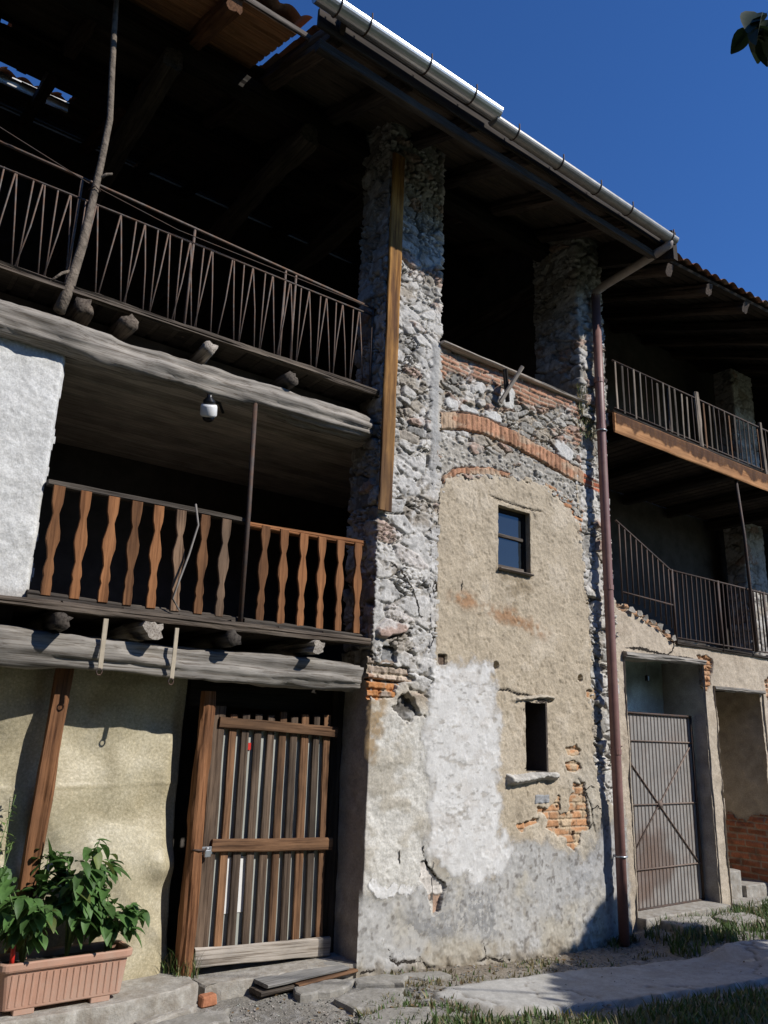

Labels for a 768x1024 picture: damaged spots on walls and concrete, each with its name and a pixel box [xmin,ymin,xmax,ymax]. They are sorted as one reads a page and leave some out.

peeling [363,654,589,913]
crack [399,846,445,883]
flaking render [726,811,768,882]